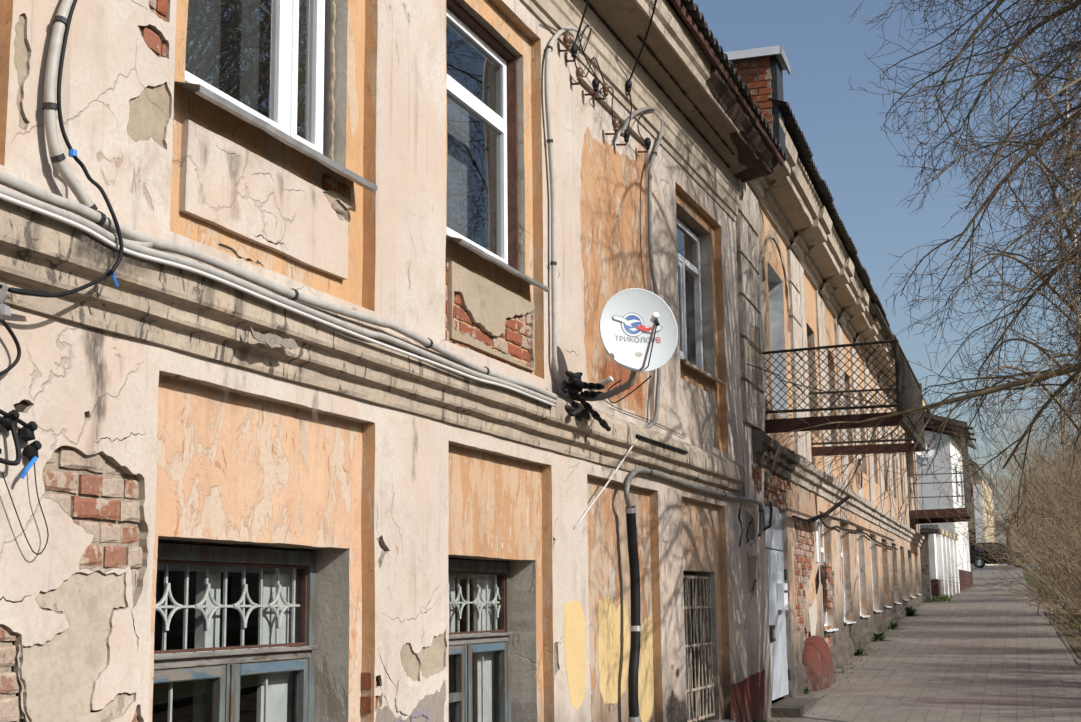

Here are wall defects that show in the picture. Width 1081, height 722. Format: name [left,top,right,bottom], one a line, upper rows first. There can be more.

spalling [127,81,172,149]
crack [217,146,302,250]
flaking render [445,258,534,374]
spalling [0,445,149,722]
spalling [743,510,760,595]
flaking render [752,464,835,647]
spalling [361,629,447,715]
leakage [666,692,687,722]